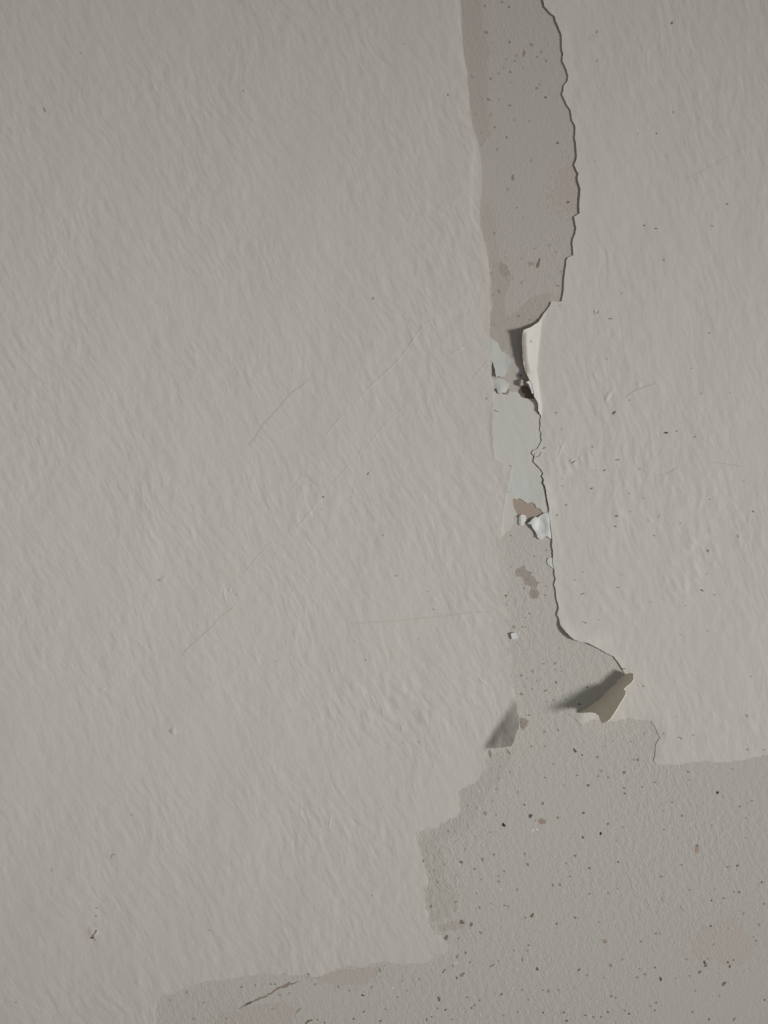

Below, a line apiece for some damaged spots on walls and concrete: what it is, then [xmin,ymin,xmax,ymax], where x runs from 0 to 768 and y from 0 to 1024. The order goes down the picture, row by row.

flaking render [467,0,577,397]
crack [531,407,549,509]
flaking render [154,498,768,1024]